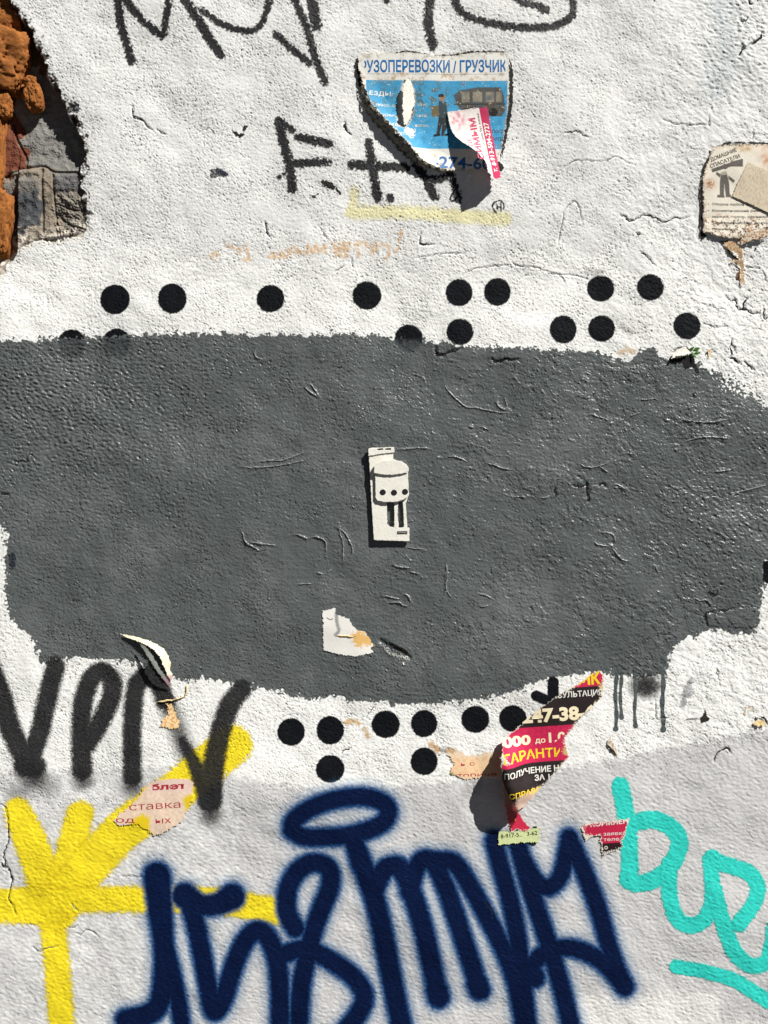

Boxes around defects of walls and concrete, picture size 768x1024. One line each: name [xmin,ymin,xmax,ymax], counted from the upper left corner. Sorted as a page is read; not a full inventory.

flaking render [0,0,89,276]